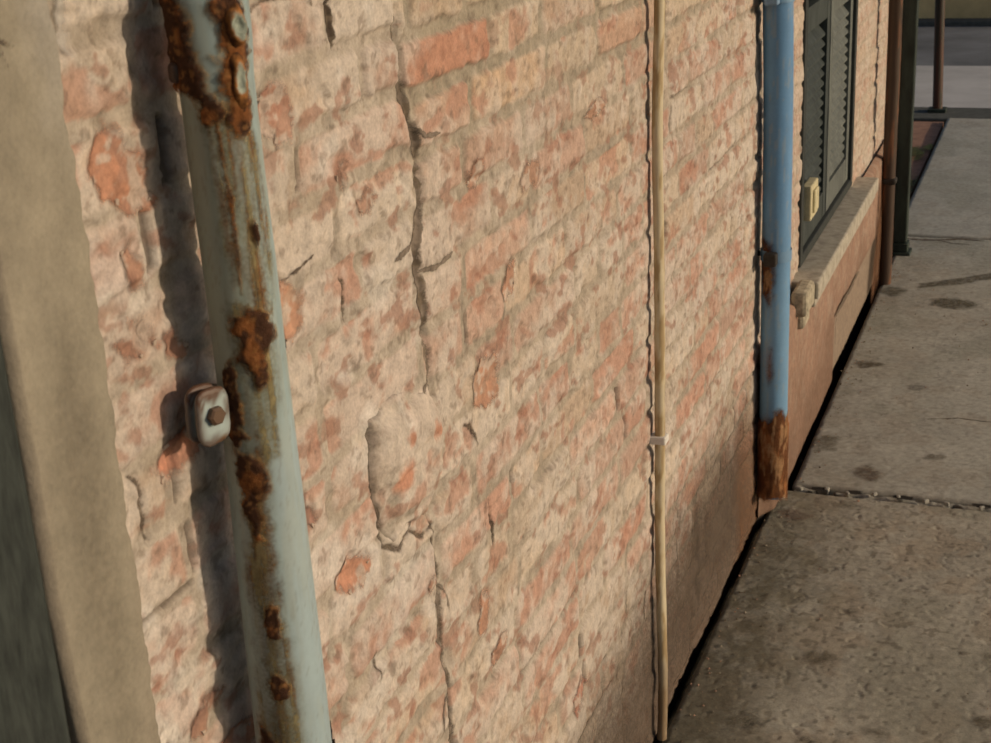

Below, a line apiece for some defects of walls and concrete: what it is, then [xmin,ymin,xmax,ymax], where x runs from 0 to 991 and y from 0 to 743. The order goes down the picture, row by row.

crack [311,0,336,49]
rust [159,0,301,743]
crack [366,439,453,743]
crack [395,80,452,394]
rust [757,410,789,502]